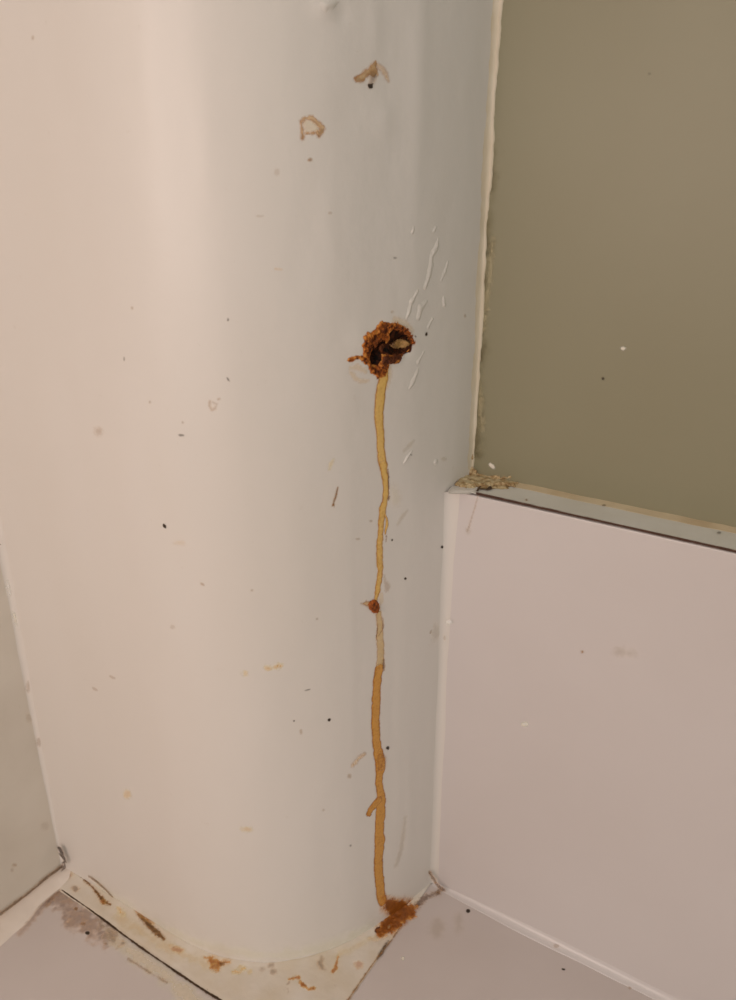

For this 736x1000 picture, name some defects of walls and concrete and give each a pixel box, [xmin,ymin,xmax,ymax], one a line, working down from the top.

peeling [354,61,377,88]
hole [370,328,414,366]